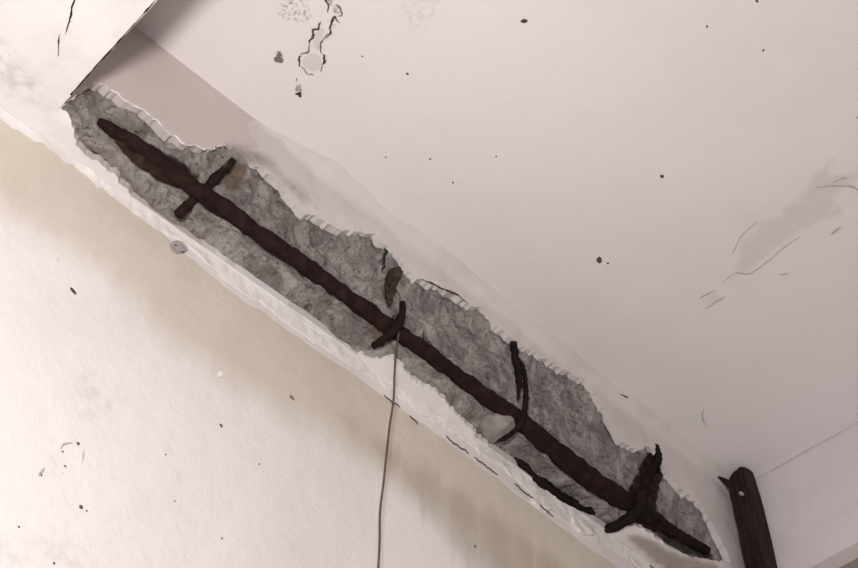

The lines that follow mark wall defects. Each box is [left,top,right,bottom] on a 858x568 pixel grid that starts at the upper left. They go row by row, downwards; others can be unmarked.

crack [58,0,75,56]
crack [70,0,156,95]
peeling [295,0,343,97]
corrosion [115,139,179,188]
spalling [0,82,650,568]
corrosion [628,452,663,511]
spalling [656,477,723,561]